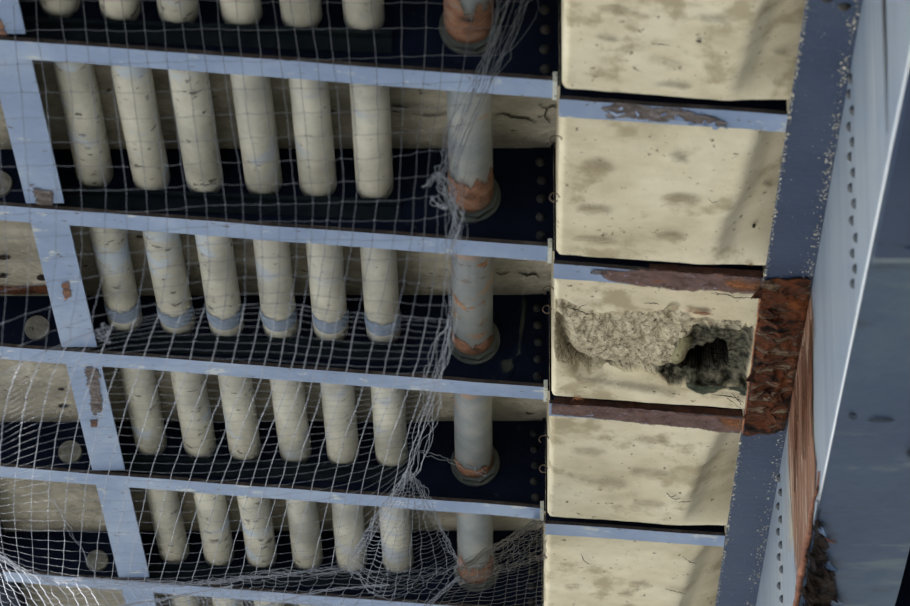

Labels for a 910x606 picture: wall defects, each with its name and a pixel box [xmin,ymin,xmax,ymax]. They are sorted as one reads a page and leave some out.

corrosion [444,0,494,44]
peeling [601,102,727,130]
corrosion [447,163,494,212]
spalling [553,296,756,392]
corrosion [551,263,844,606]